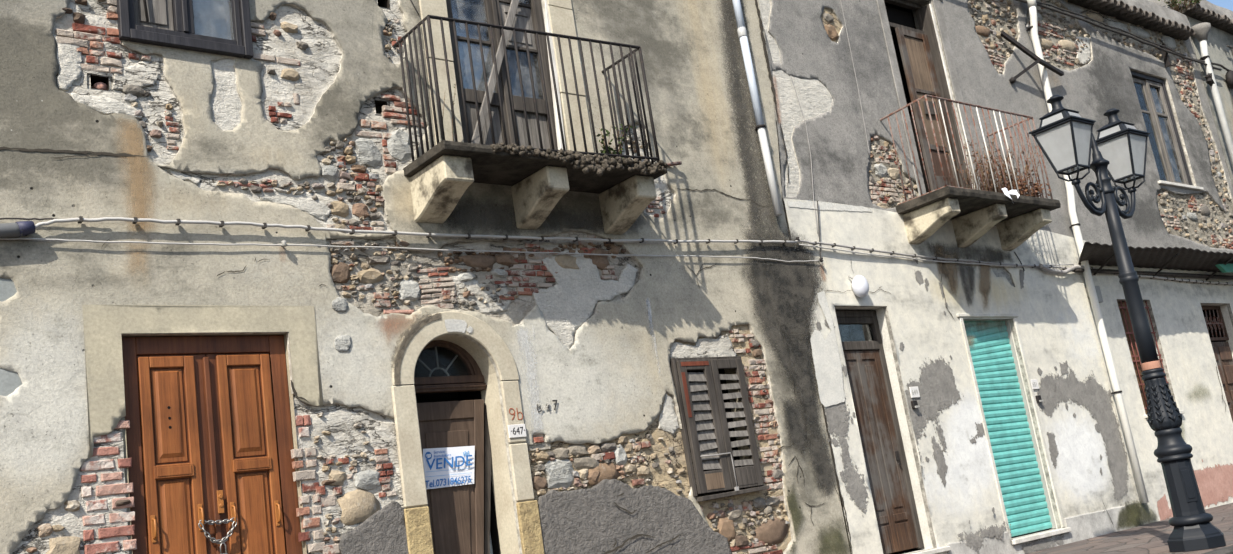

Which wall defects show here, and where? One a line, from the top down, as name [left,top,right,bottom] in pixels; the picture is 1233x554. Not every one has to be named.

flaking render [53,0,641,349]
damp [721,0,836,496]
flaking render [758,0,918,212]
flaking render [967,0,1233,250]
flaking render [12,418,137,554]
flaking render [291,395,407,554]
flaking render [528,325,791,554]
damp [787,490,804,551]
peeling [810,292,869,513]
peeling [905,355,964,488]
peeling [970,422,985,445]
peeling [1037,360,1131,506]